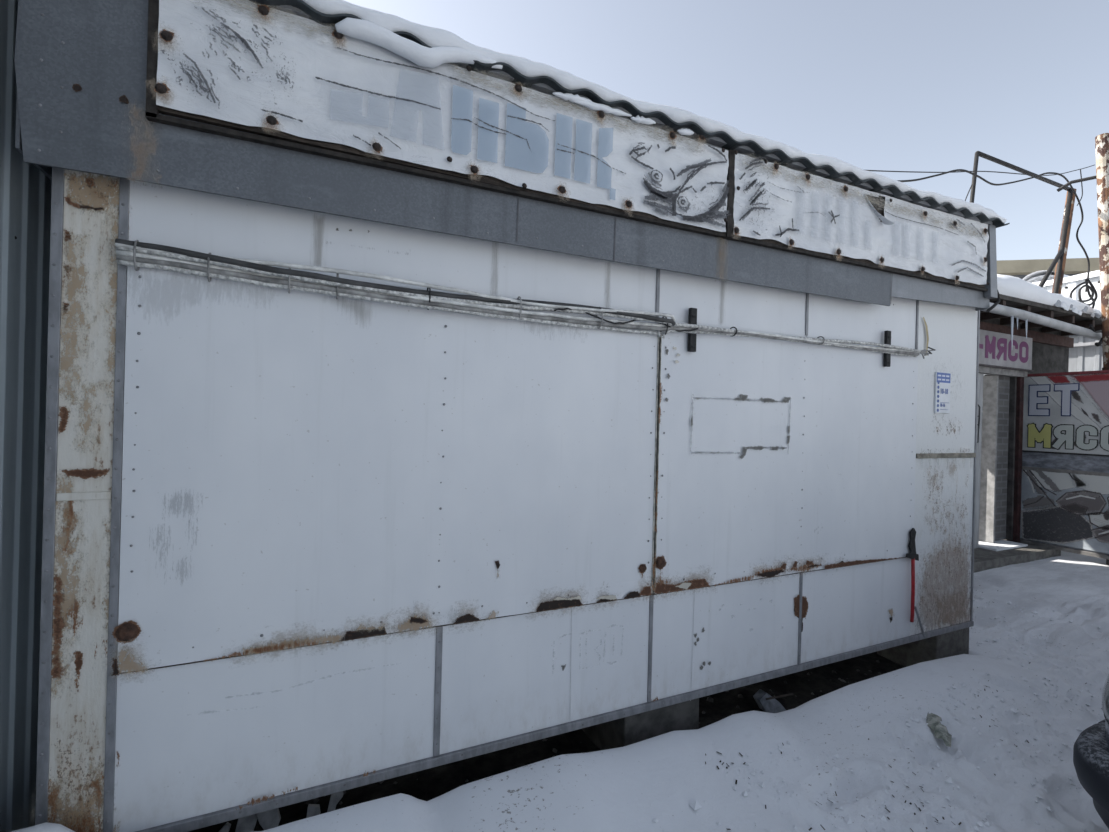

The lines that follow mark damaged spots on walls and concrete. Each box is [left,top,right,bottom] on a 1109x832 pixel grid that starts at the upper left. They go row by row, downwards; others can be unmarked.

rust [58,230,117,447]
rust [51,467,147,695]
rust [638,553,902,595]
rust [398,614,431,632]
rust [794,595,808,632]
rust [205,635,341,662]
rust [48,738,117,832]